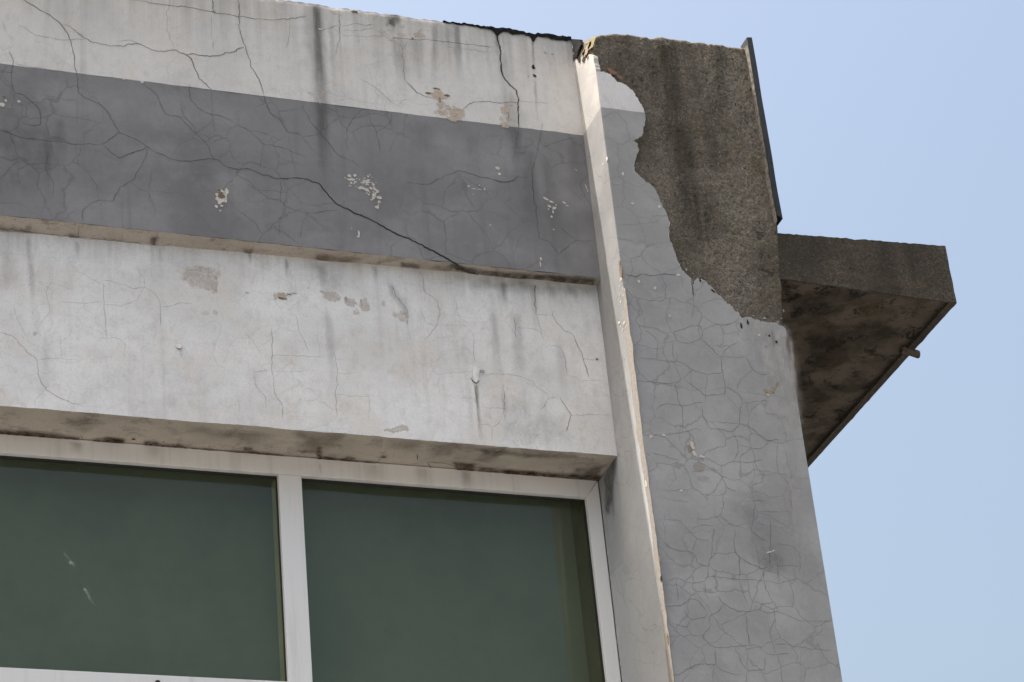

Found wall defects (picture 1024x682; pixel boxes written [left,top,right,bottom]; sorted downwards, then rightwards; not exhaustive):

crack [24,0,299,91]
peeling [425,88,465,122]
crack [396,32,519,125]
spalling [215,188,229,212]
crack [246,168,459,266]
peeling [345,174,382,209]
flaking render [572,34,784,326]